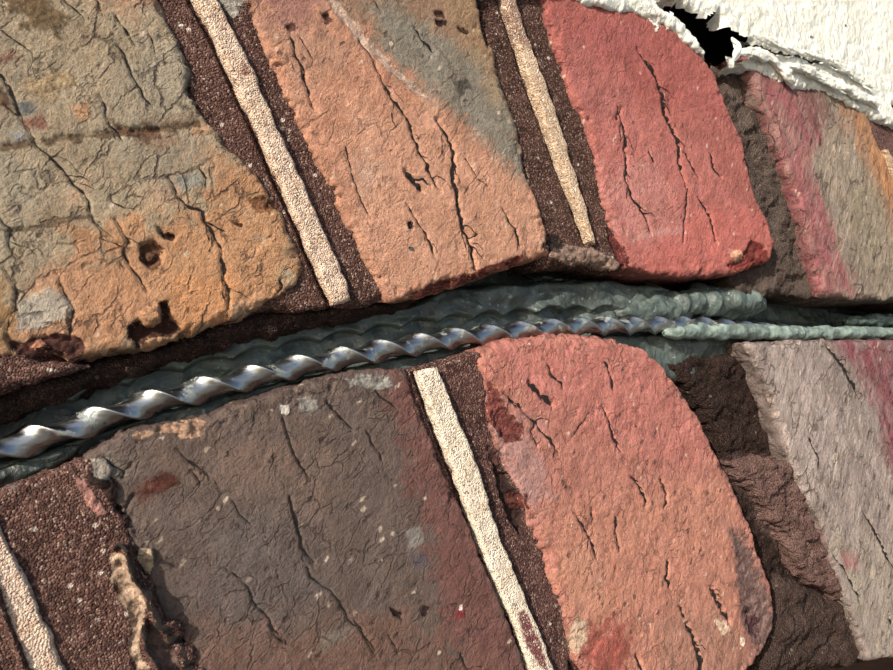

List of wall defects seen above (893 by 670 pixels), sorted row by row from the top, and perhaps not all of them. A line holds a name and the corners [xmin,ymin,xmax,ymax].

crack [0,74,148,293]
spalling [139,232,175,270]
crack [169,179,246,306]
crack [359,41,489,270]
crack [616,110,657,235]
crack [637,51,719,240]
spalling [9,333,85,364]
spalling [127,300,180,349]
crack [505,365,563,457]
crack [114,543,193,670]
crack [679,606,706,670]
spalling [729,529,773,646]